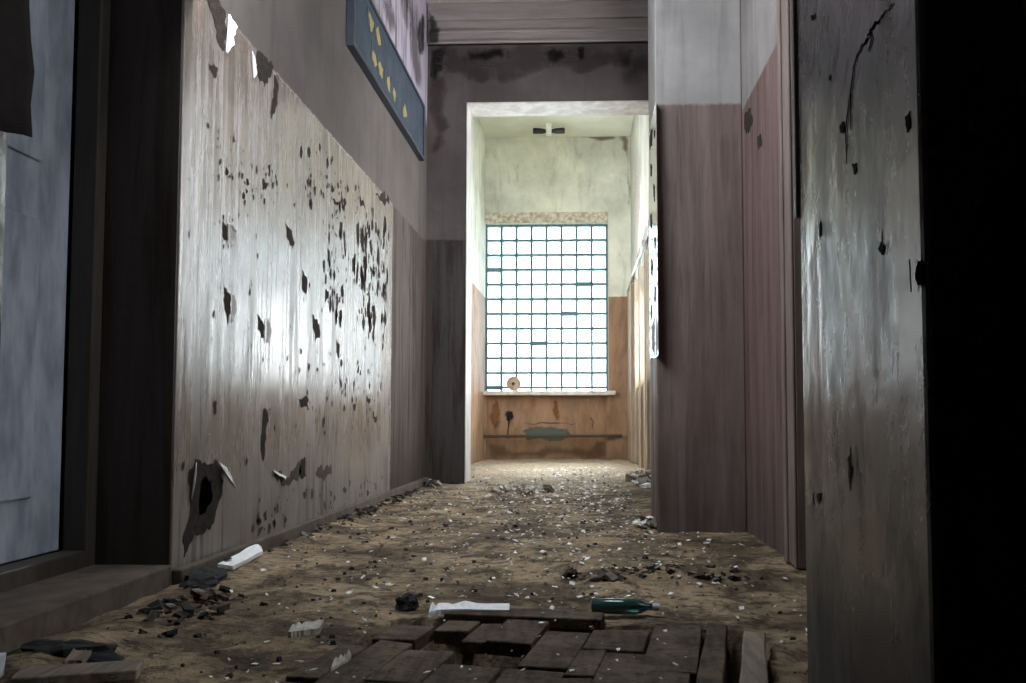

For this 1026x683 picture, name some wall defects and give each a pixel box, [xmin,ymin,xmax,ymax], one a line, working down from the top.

peeling [0,0,35,137]
peeling [207,0,238,54]
peeling [252,50,279,119]
damp [383,0,420,84]
damp [431,46,647,149]
crack [845,3,893,164]
peeling [213,159,295,263]
peeling [300,144,389,350]
peeling [213,286,237,324]
peeling [249,315,272,348]
peeling [299,340,382,435]
peeling [182,459,237,557]